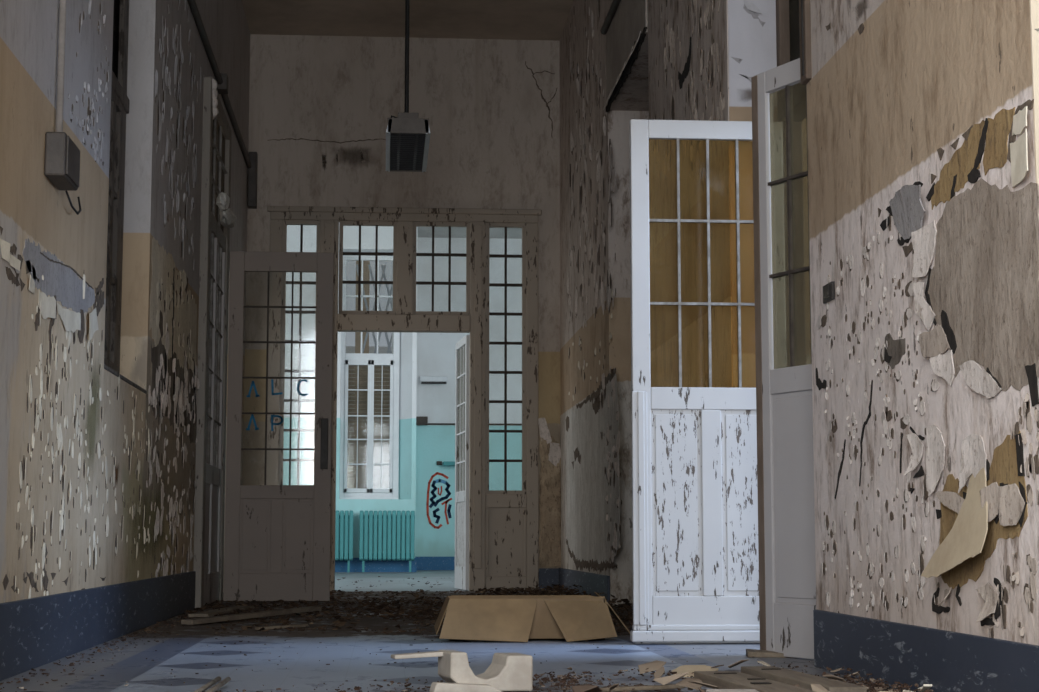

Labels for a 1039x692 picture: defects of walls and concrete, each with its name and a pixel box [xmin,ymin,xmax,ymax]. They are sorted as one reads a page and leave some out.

peeling [0,0,202,599]
peeling [566,0,647,572]
peeling [654,0,751,121]
peeling [817,99,1039,638]